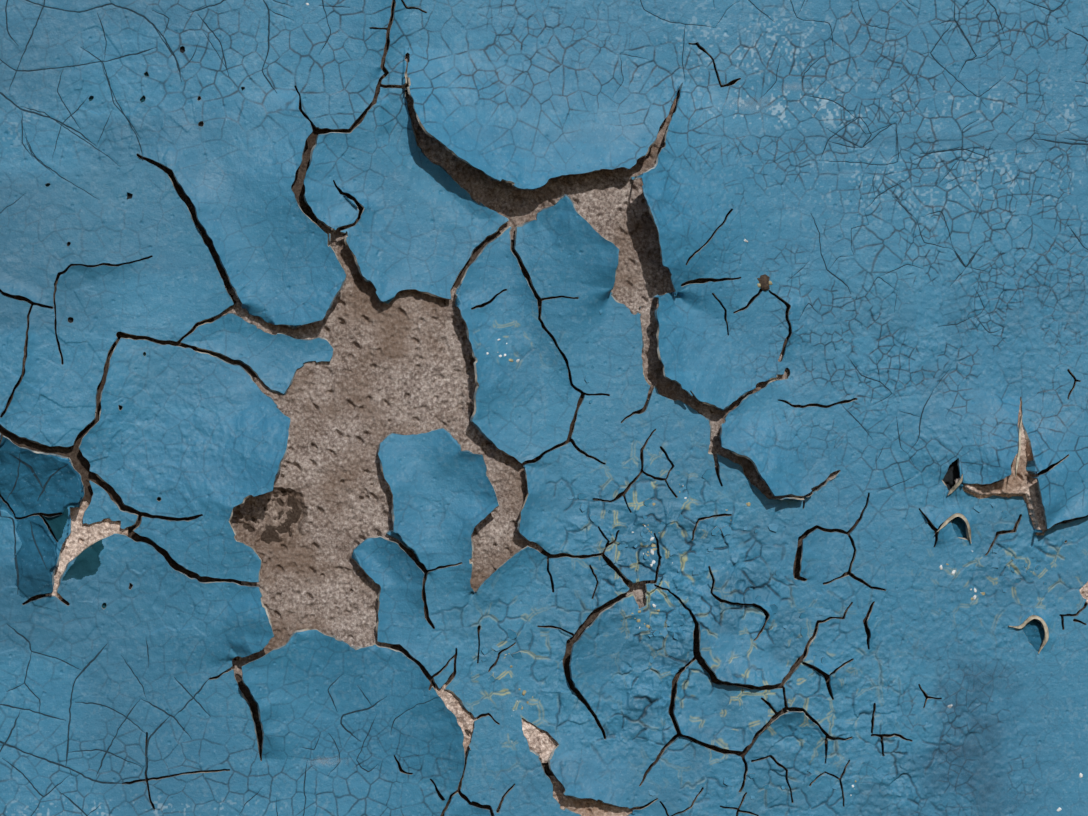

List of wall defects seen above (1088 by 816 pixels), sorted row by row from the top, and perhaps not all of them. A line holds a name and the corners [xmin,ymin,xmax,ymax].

crack [262,0,426,230]
crack [640,0,1006,356]
crack [0,0,257,605]
crack [0,624,263,816]
crack [239,625,515,816]
crack [377,531,454,627]
peeling [0,32,859,816]
crack [444,230,608,464]
crack [985,515,1021,555]
peeling [937,397,1088,592]
spalling [1008,615,1049,654]
crack [1059,603,1087,628]